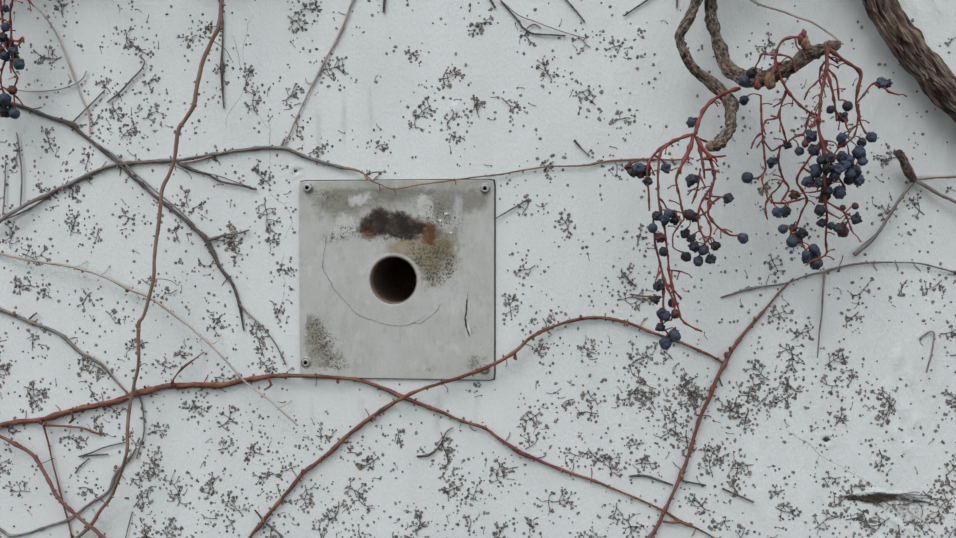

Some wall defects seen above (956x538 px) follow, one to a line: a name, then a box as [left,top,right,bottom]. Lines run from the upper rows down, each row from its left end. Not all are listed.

rust [357,207,452,266]
crack [322,237,441,326]
mould [307,318,341,369]
crack [464,294,472,336]